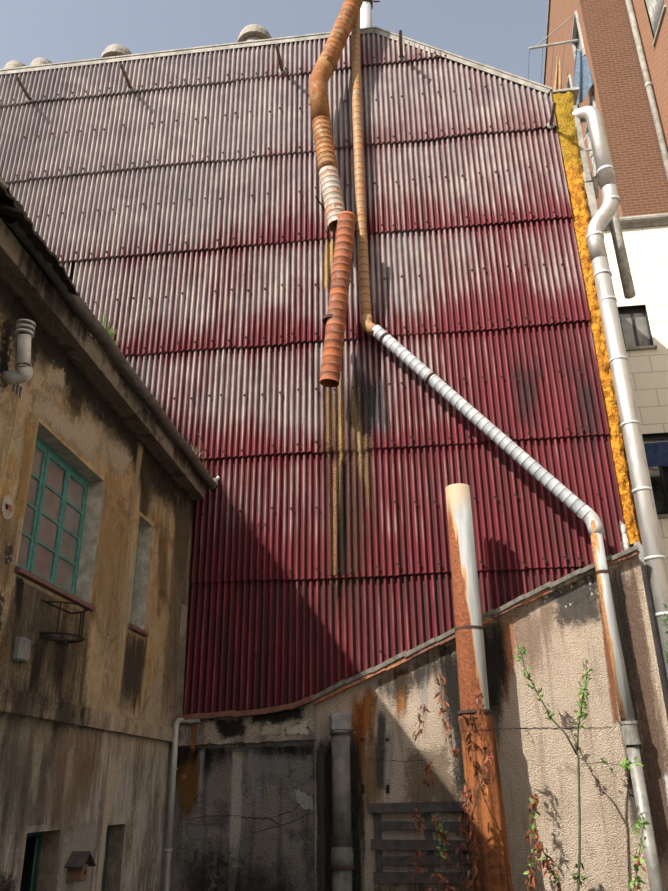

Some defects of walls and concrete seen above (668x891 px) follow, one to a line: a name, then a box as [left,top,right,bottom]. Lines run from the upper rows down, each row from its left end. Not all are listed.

rust [312,115,338,172]
leakage [211,706,304,739]
rust [352,689,381,811]
leakage [96,747,123,891]
leakage [184,748,290,891]